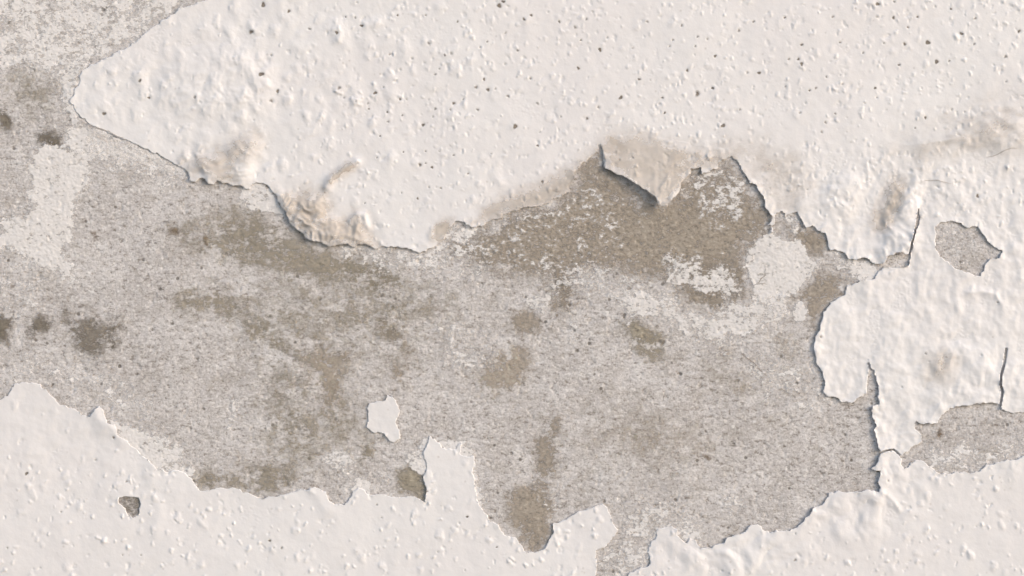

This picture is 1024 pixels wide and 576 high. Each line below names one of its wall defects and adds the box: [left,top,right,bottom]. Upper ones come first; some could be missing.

leakage [203,193,397,289]
peeling [562,213,605,258]
leakage [455,138,767,308]
peeling [935,221,1002,276]
leakage [802,275,841,320]
leakage [626,319,662,362]
leakage [274,348,350,452]
peeling [897,348,1024,474]
peeling [118,496,141,518]
leakage [397,465,426,500]
leakage [505,417,561,551]
peeling [620,558,642,576]